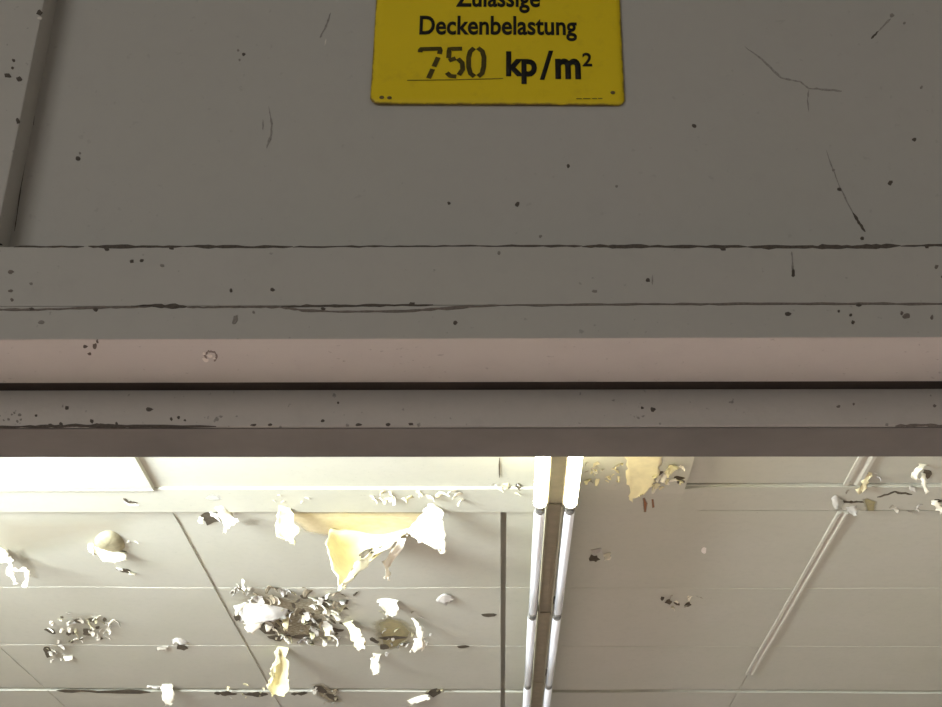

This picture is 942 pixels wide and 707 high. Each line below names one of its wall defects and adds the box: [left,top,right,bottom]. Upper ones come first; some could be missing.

crack [747,48,842,112]
peeling [584,457,685,503]
peeling [831,464,932,516]
peeling [198,506,239,534]
peeling [0,547,31,588]
peeling [230,490,464,697]
peeling [43,613,121,664]
peeling [310,685,339,704]
peeling [406,688,444,707]